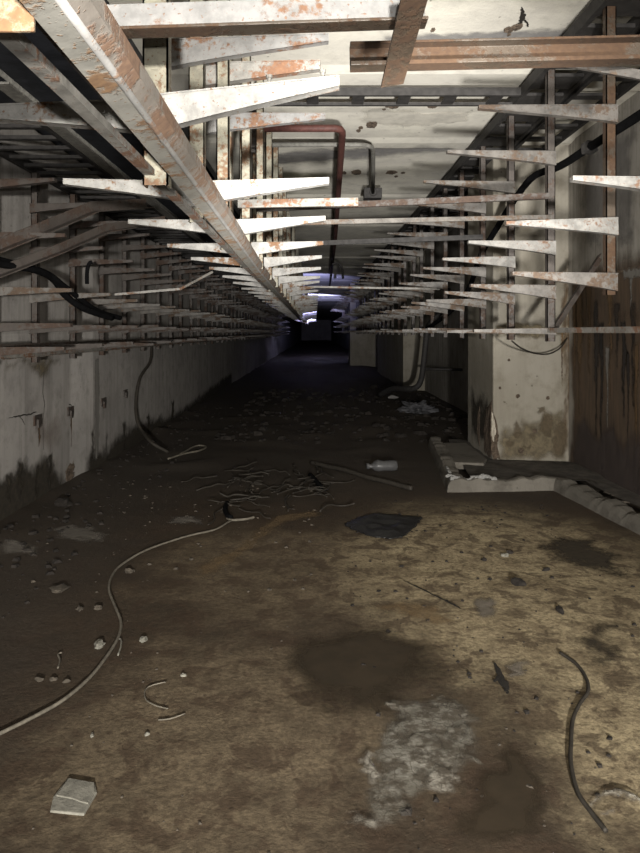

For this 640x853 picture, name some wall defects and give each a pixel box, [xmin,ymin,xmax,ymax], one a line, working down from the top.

damp [0,455,62,521]
damp [471,395,488,438]
damp [501,407,640,496]
damp [294,631,480,827]
damp [462,752,541,837]